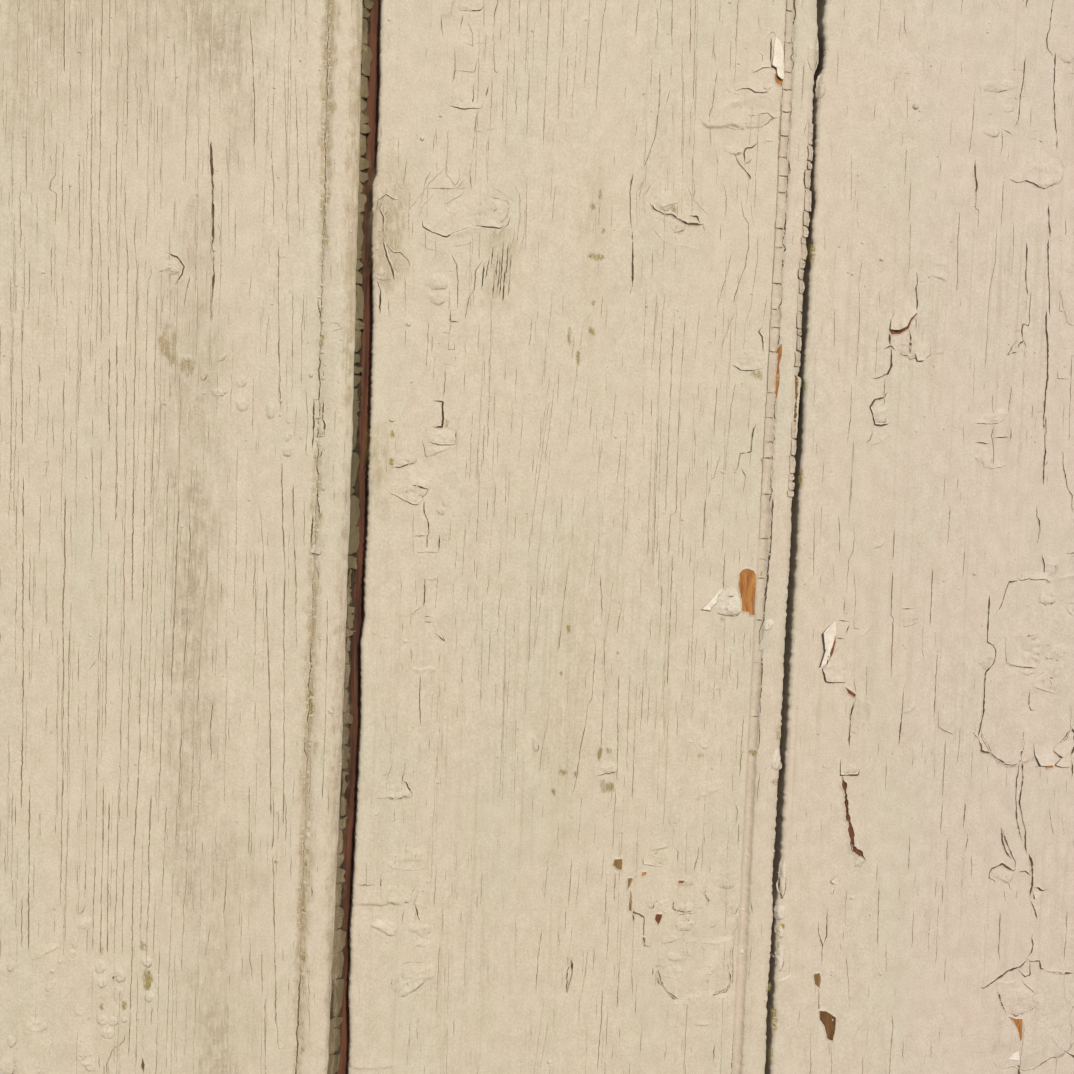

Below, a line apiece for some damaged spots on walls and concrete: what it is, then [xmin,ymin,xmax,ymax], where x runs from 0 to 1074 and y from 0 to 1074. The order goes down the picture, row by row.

peeling [700,31,784,131]
peeling [389,399,456,505]
crack [943,477,996,576]
peeling [1062,452,1074,511]
peeling [701,566,757,617]
peeling [821,619,870,746]
peeling [973,555,1074,776]
crack [798,529,1074,1074]
peeling [611,841,742,1005]
peeling [817,1005,837,1043]
peeling [974,934,1074,1074]